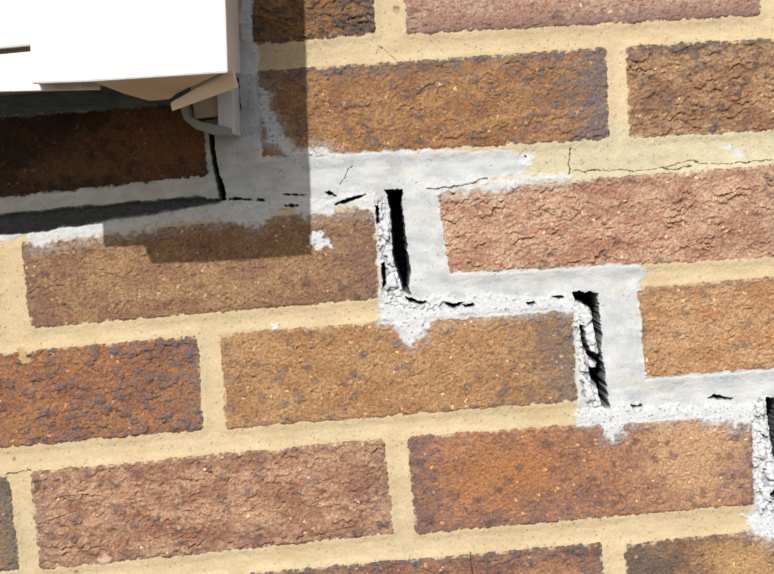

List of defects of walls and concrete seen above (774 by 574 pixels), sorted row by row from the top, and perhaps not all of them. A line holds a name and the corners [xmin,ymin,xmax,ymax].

crack [567,147,774,175]
crack [526,290,611,409]
crack [707,393,733,401]
crack [765,397,774,458]